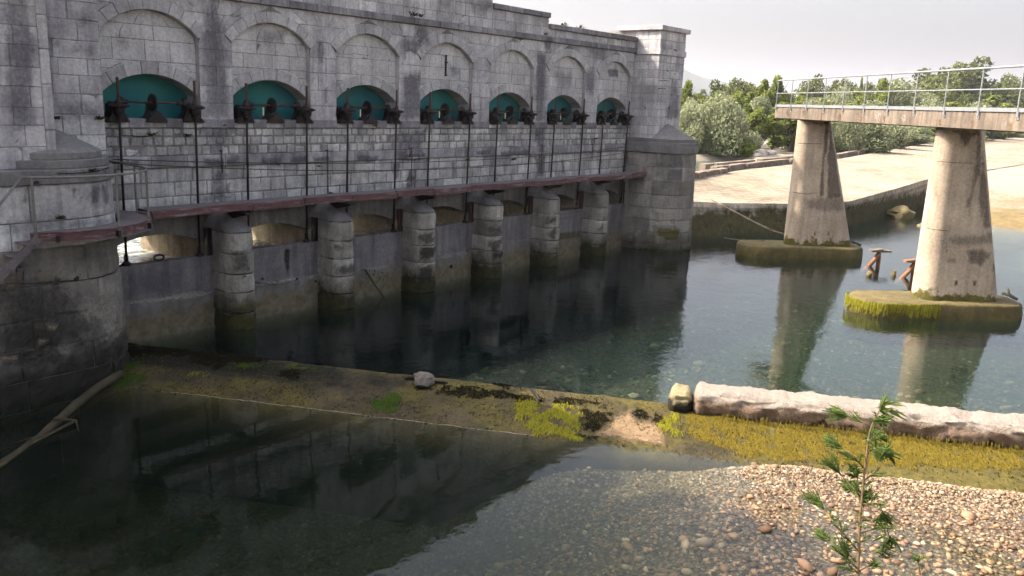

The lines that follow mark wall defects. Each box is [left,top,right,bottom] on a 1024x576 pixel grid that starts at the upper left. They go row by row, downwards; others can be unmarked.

damp [820,126,840,198]
damp [968,134,990,227]
damp [969,251,994,268]